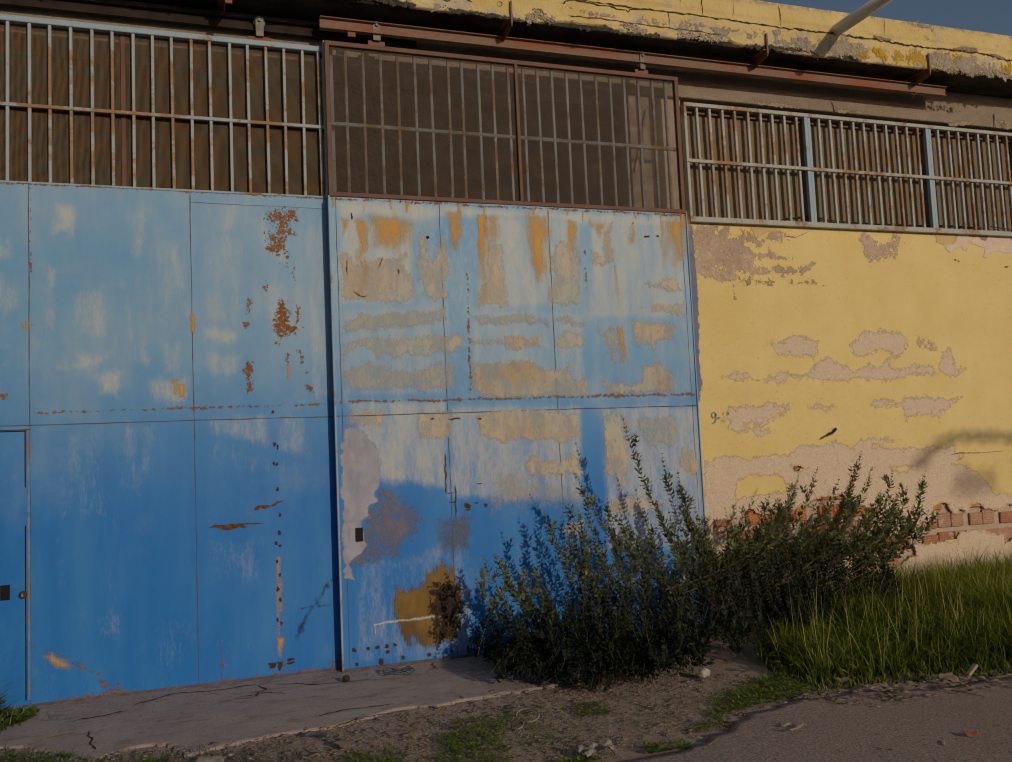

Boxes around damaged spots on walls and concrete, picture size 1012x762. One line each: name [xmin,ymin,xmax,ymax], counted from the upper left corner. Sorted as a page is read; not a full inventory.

spalling [931,46,1012,82]
rust [252,194,689,281]
peeling [693,223,824,300]
rust [34,380,259,414]
peeling [338,232,588,443]
rust [272,299,695,407]
peeling [602,361,673,394]
peeling [634,278,686,349]
peeling [723,328,966,384]
peeling [604,411,665,516]
peeling [680,436,1012,617]
rust [254,559,465,678]